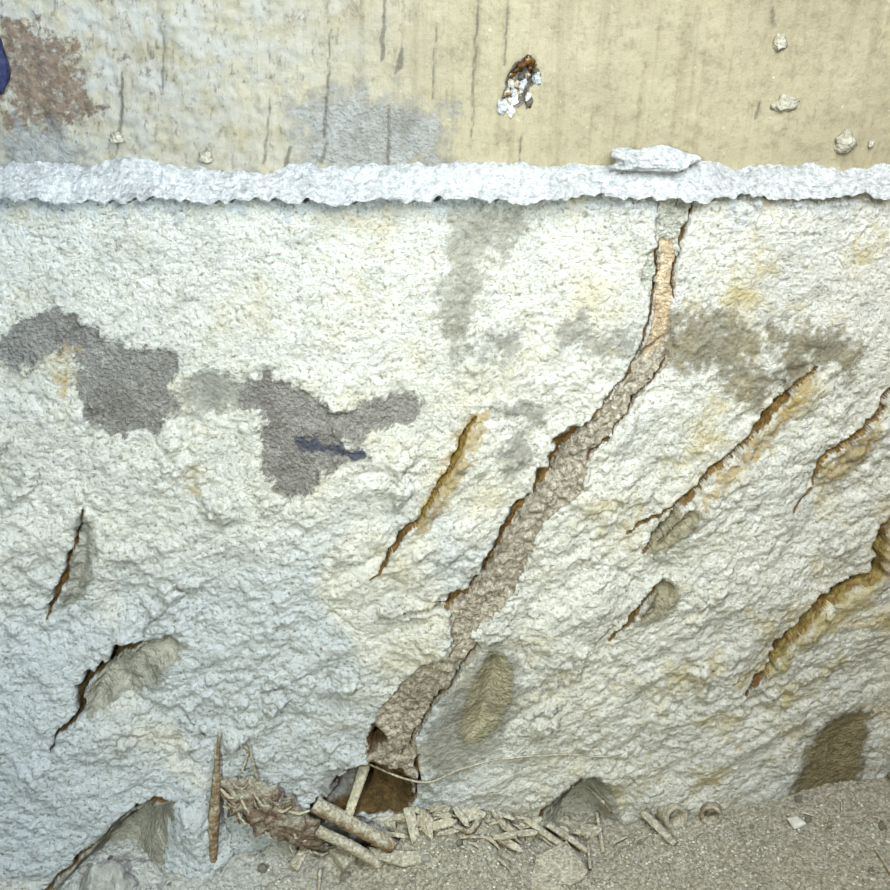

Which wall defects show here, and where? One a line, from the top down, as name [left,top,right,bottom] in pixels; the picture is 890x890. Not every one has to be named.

water stain [0,15,106,167]
water stain [663,295,870,419]
spalling [46,509,97,620]
crack [322,198,693,814]
spalling [608,579,680,641]
crack [626,366,818,555]
crack [745,517,890,697]
crack [794,387,890,513]
spalling [49,635,186,751]
spalling [45,845,93,890]